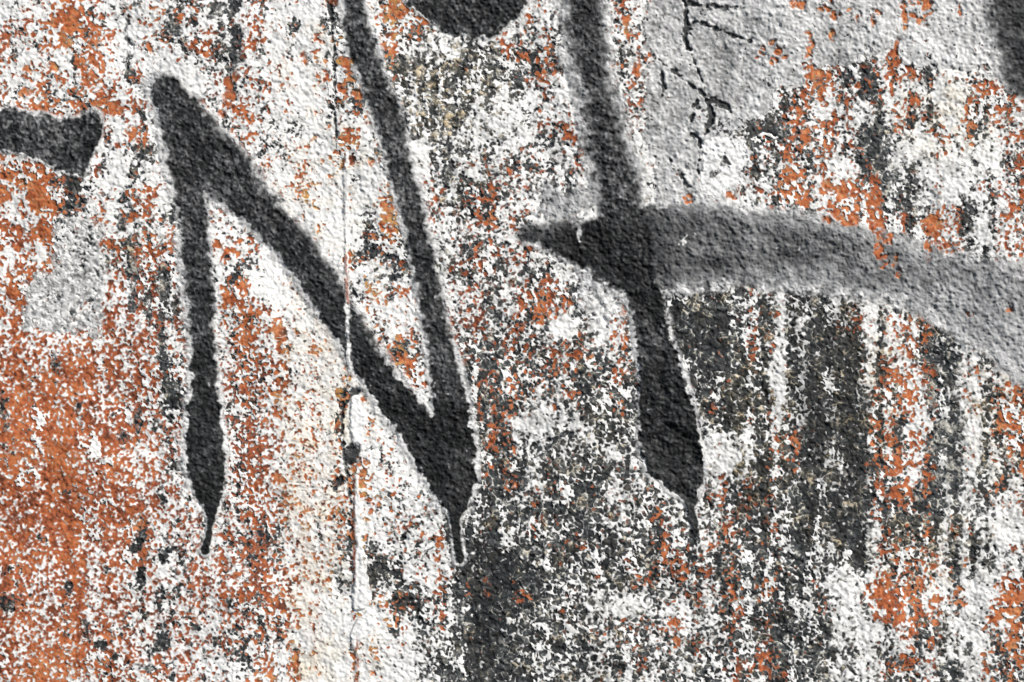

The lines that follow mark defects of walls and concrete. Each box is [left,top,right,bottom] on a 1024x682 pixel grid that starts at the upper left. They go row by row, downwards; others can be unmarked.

peeling [0,0,332,682]
spalling [308,0,1024,682]
crack [652,0,752,188]